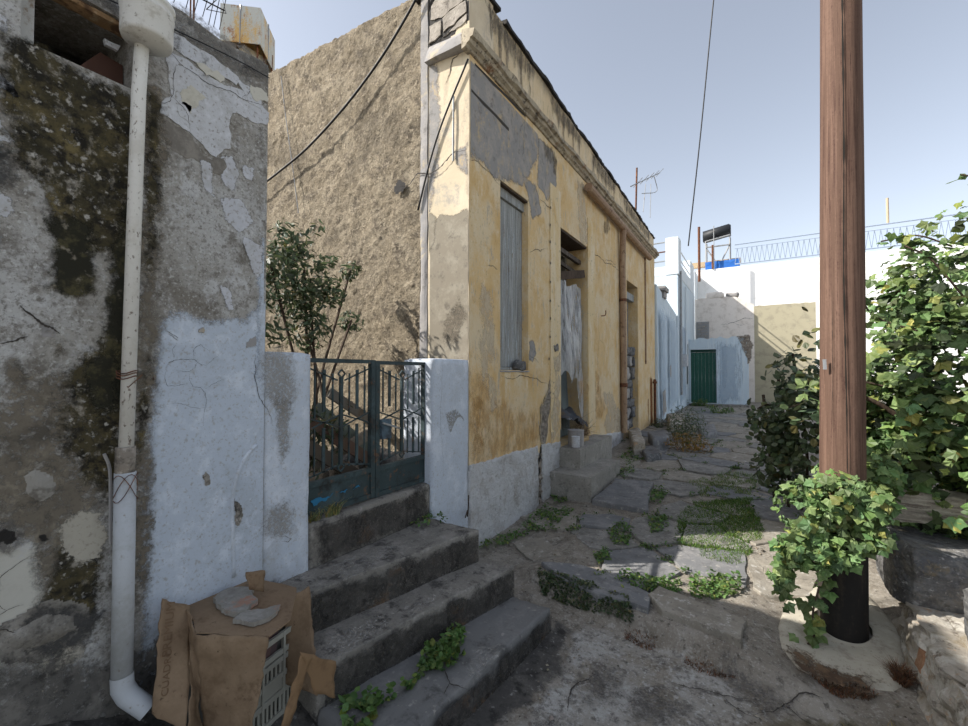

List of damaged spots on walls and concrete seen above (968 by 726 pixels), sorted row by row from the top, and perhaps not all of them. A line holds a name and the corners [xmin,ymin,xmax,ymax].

peeling [0,120,15,144]
flaking render [454,61,557,219]
peeling [139,33,269,661]